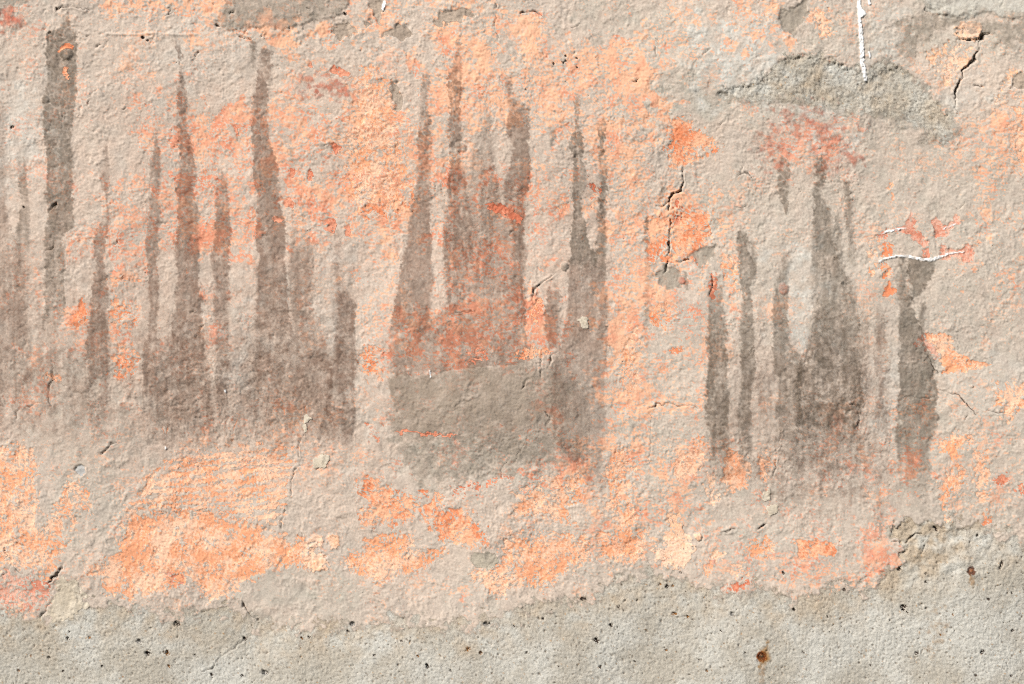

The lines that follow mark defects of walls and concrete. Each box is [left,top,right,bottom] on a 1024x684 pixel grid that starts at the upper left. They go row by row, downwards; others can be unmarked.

peeling [332,0,412,41]
crack [954,33,988,94]
peeling [323,64,420,237]
peeling [660,116,719,170]
peeling [485,202,523,225]
peeling [643,198,742,331]
peeling [514,344,551,360]
peeling [0,428,1024,684]
corrosion [756,642,770,662]